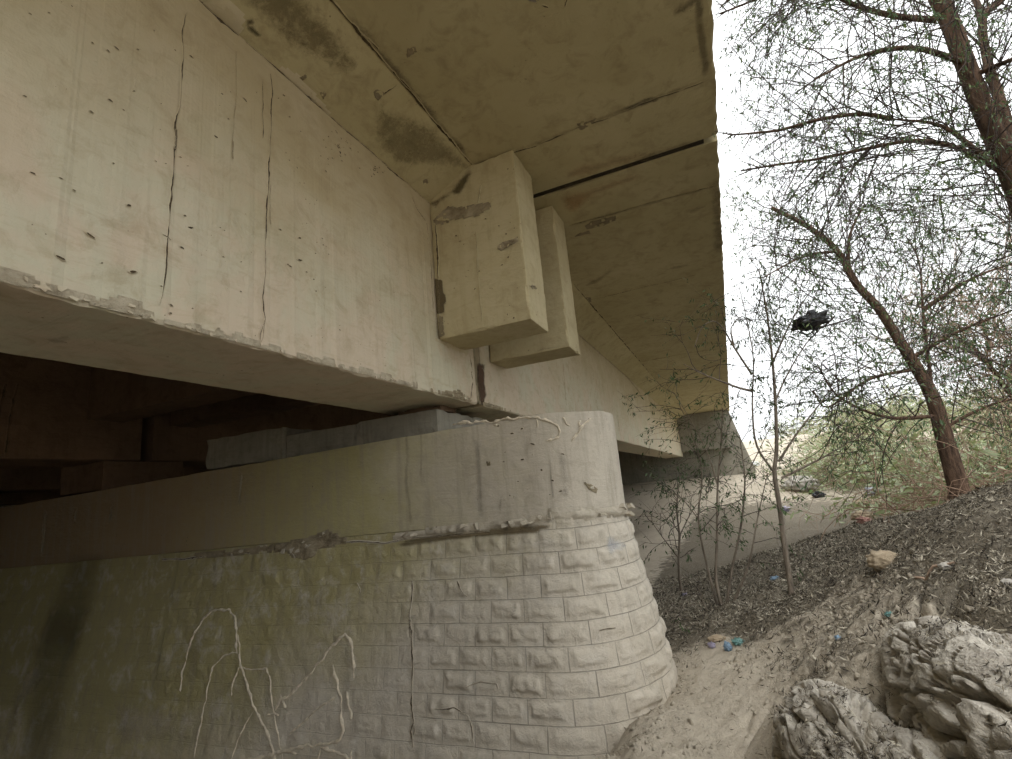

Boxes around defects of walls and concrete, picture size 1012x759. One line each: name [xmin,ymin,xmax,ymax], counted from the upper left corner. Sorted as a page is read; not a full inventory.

crack [329,0,474,165]
crack [158,0,440,342]
spalling [433,202,491,225]
spalling [0,266,285,354]
spalling [297,352,418,388]
corrosion [478,364,487,403]
spalling [194,529,347,560]
crack [409,581,499,748]